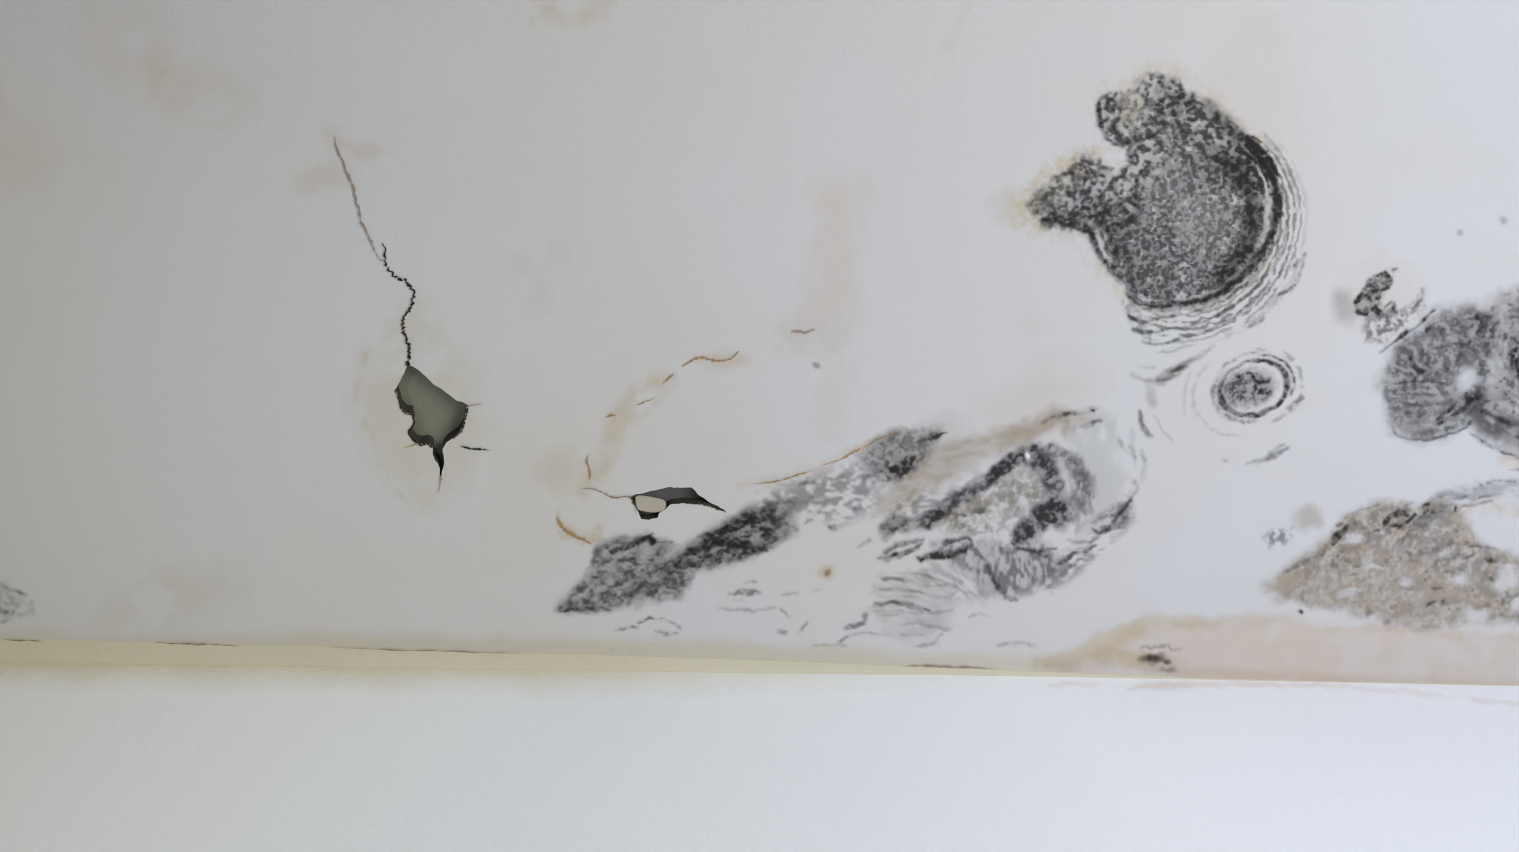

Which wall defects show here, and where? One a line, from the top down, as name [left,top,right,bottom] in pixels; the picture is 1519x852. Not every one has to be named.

crack [334,137,416,366]
leakage [1030,75,1283,334]
leakage [1354,269,1397,317]
spalling [395,366,486,492]
leakage [1219,355,1295,418]
leakage [1389,310,1515,442]
peeling [583,487,726,520]
leakage [561,509,784,612]
leakage [883,424,1130,589]
leakage [1278,503,1511,618]